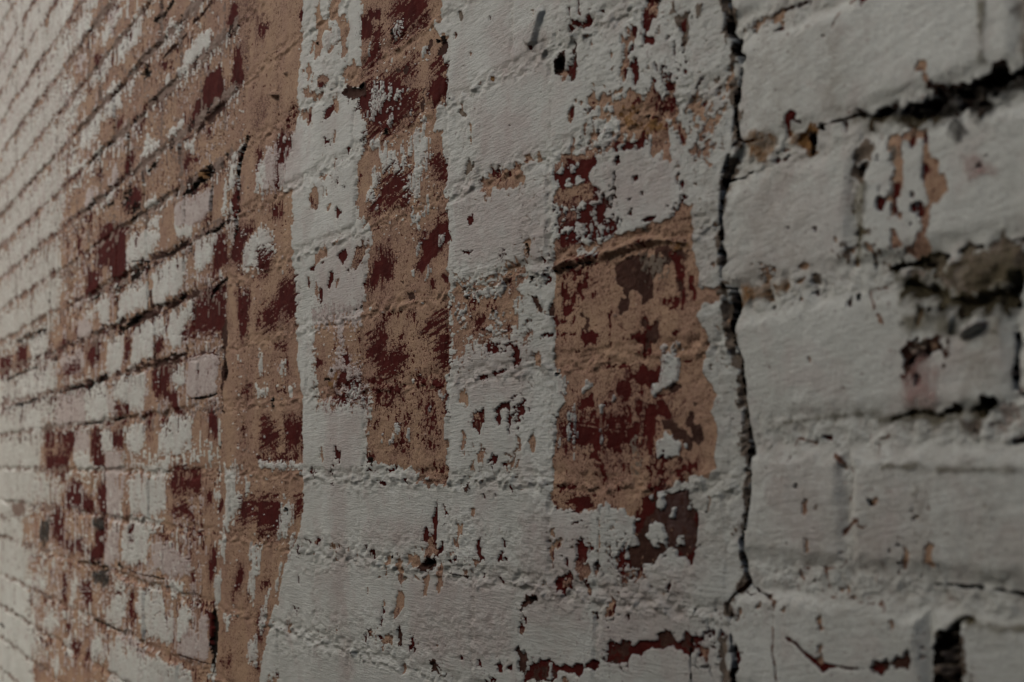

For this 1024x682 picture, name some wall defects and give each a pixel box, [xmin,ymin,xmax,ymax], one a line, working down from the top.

crack [817,112,867,131]
peeling [0,0,743,682]
crack [712,0,777,682]
peeling [752,262,822,310]
peeling [850,124,1024,295]